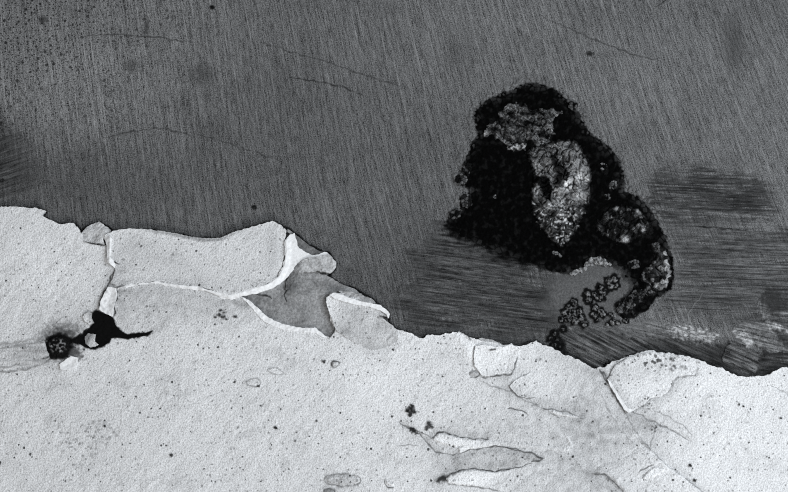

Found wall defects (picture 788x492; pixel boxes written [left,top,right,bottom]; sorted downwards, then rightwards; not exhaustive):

corrosion [444,76,677,354]
corrosion [45,327,84,370]
peeling [81,221,398,350]
peeling [454,330,543,399]